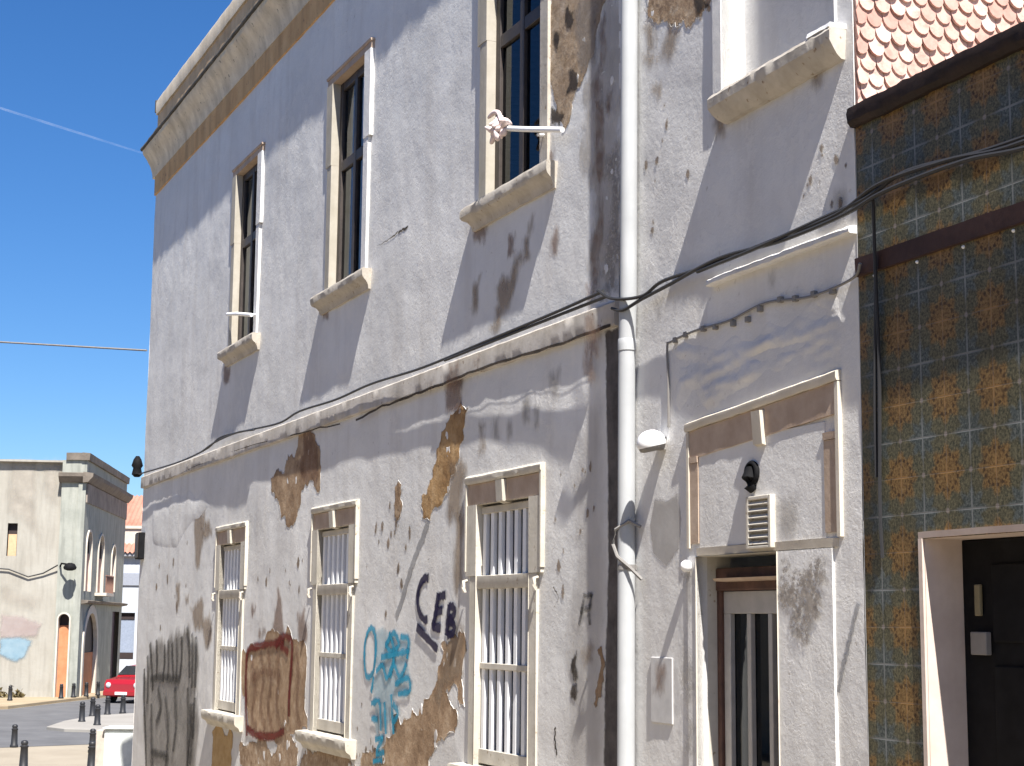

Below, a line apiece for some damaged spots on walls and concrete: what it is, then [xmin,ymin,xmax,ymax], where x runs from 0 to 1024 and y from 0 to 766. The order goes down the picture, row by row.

flaking render [550,0,605,129]
flaking render [645,0,712,28]
flaking render [271,431,321,528]
flaking render [375,480,411,550]
flaking render [421,381,468,520]
flaking render [211,626,467,766]